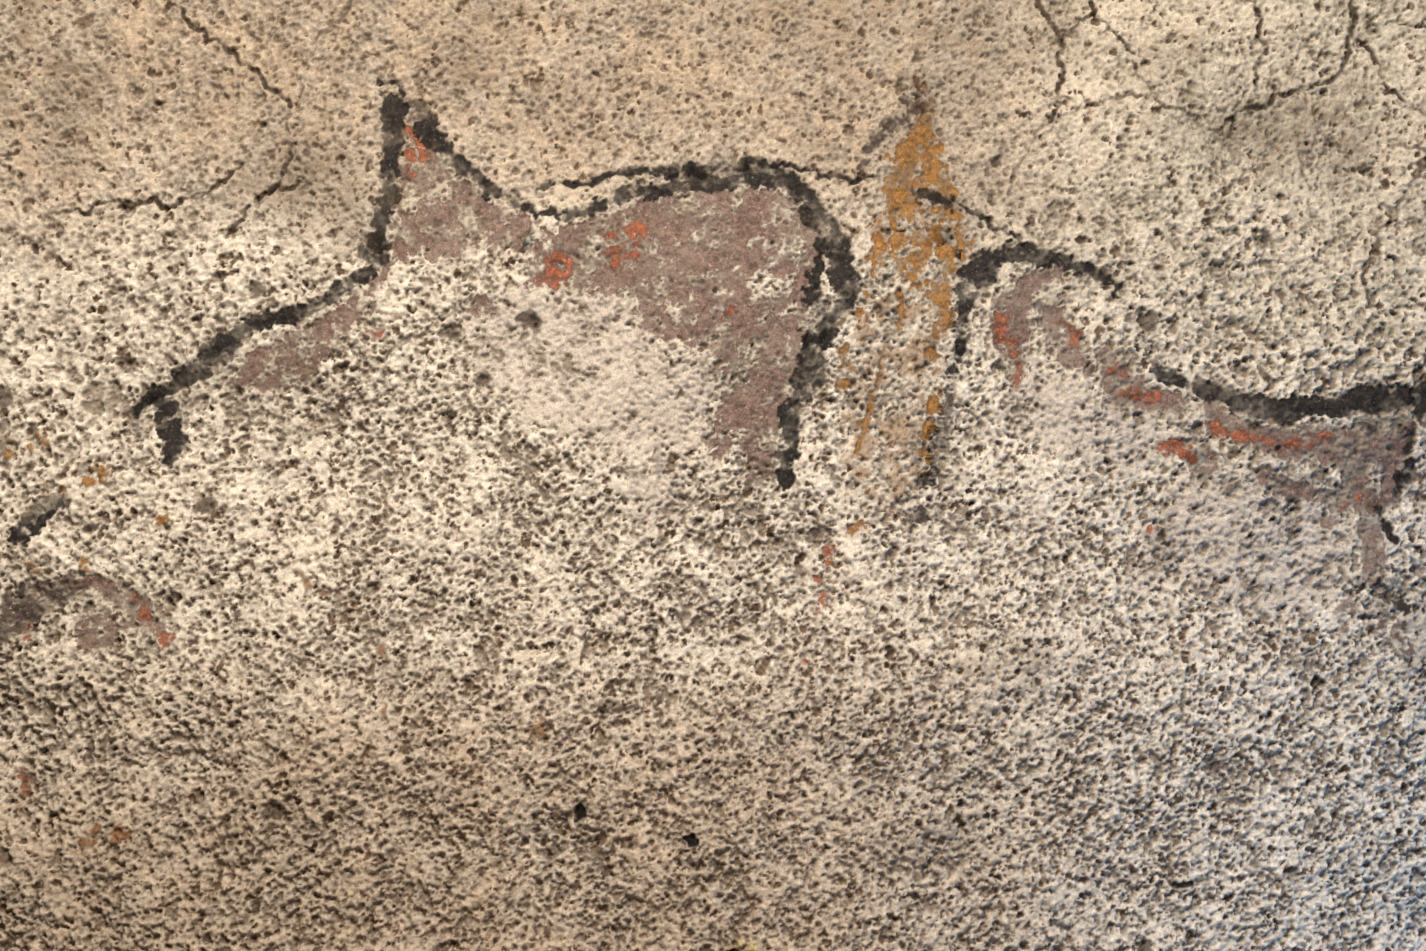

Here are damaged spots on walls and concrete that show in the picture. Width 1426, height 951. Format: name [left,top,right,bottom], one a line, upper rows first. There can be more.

crack [52,0,303,236]
crack [1035,0,1426,303]